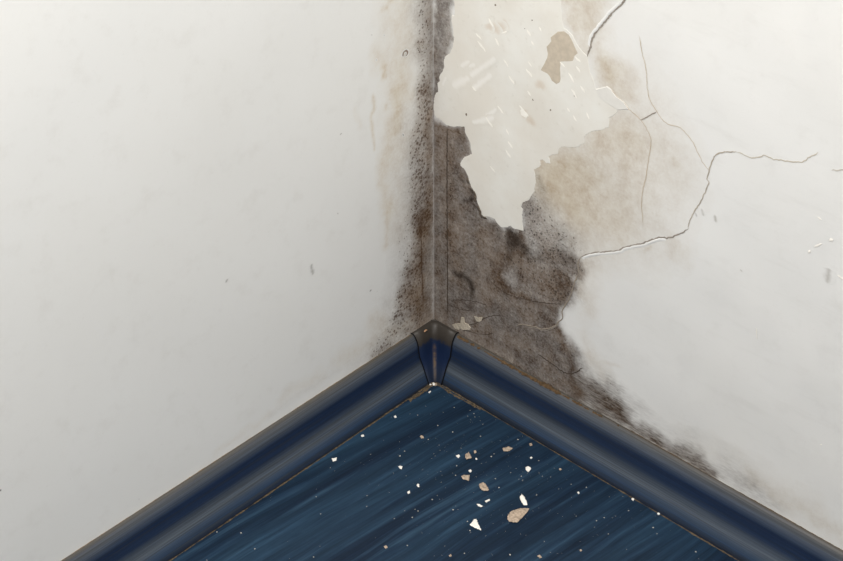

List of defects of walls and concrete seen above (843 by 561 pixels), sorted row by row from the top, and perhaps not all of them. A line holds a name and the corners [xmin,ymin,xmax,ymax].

crack [446,137,499,335]
water stain [212,0,843,550]
peeling [434,0,629,231]
crack [587,0,625,56]
crack [492,37,818,331]